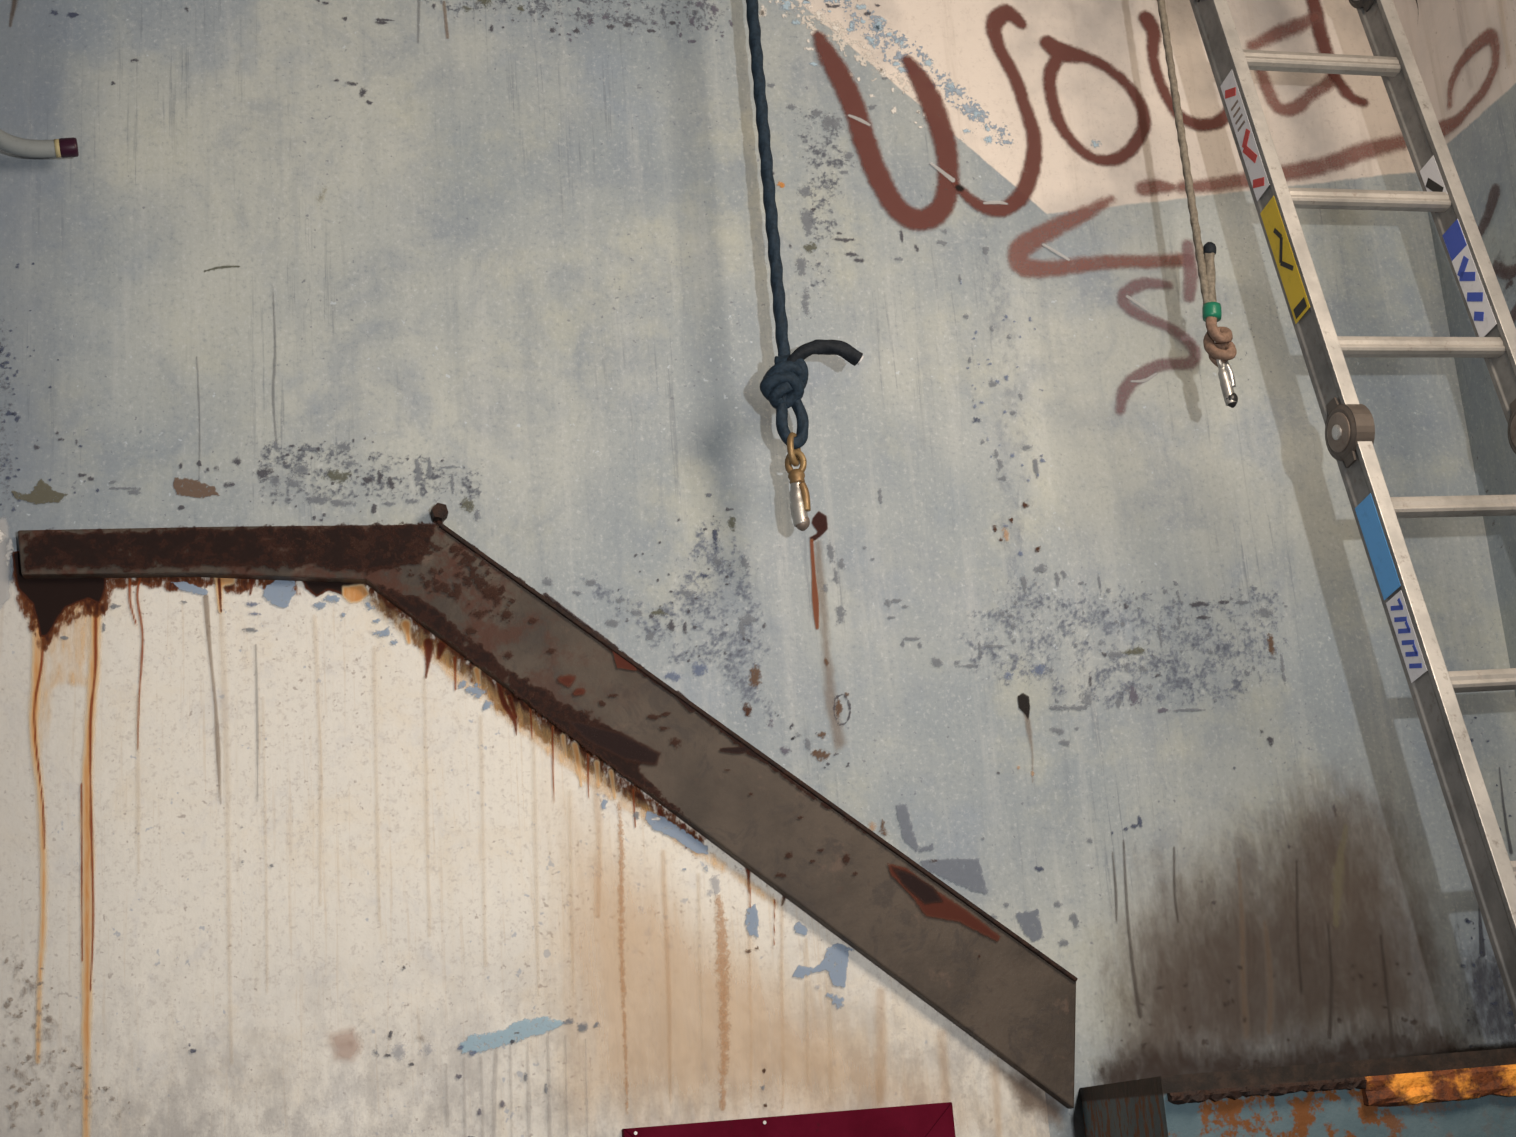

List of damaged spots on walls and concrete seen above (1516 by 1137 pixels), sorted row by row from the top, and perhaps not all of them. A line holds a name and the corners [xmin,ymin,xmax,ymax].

peeling [759,0,1013,146]
peeling [773,104,864,318]
peeling [0,330,141,608]
peeling [173,457,241,510]
peeling [250,437,481,521]
rust [1018,693,1030,718]
rust [12,511,872,1137]
peeling [879,803,989,894]
peeling [793,943,853,1009]
peeling [990,901,1079,946]
damp [1100,823,1516,1084]
peeling [458,1016,598,1056]